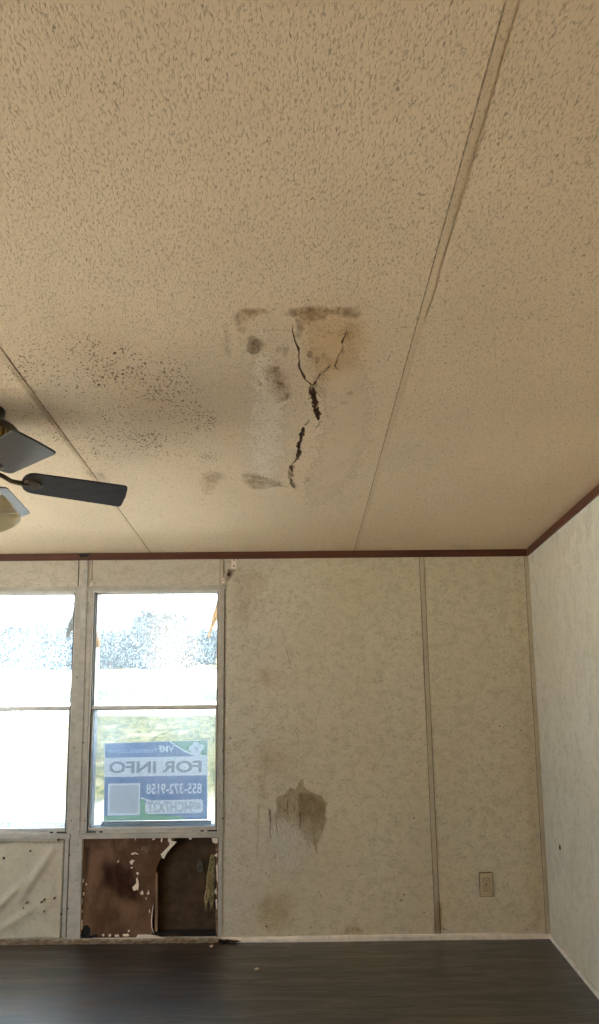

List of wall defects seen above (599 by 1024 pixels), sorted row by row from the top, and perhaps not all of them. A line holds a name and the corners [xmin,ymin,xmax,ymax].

crack [287,327,348,489]
spalling [117,837,240,943]